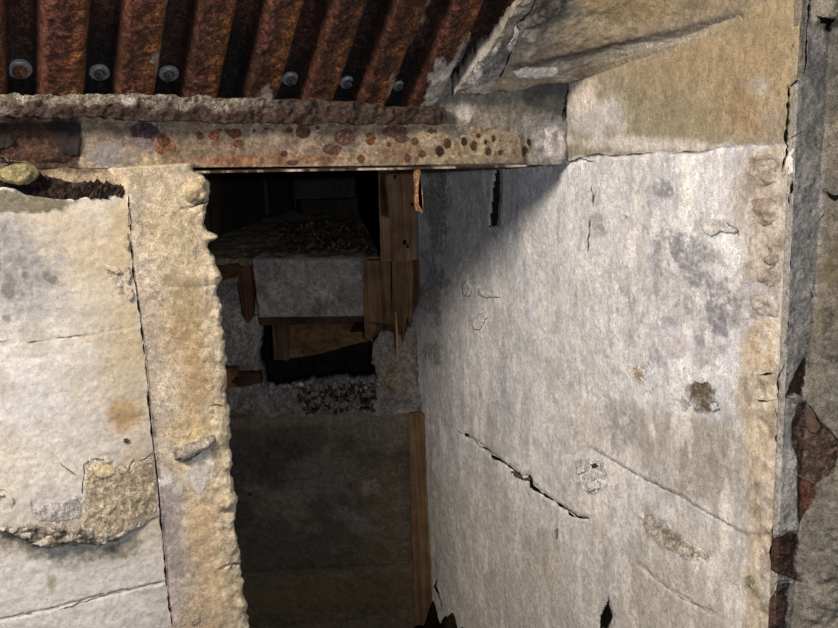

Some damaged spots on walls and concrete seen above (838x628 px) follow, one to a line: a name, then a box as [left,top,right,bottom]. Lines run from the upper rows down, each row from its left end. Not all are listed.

crack [492,0,535,82]
rust [196,120,243,147]
rust [286,125,320,139]
rust [322,129,355,155]
rust [366,125,426,162]
rust [436,138,451,157]
rust [461,133,504,156]
crack [781,0,810,203]
crack [52,197,172,624]
crack [757,366,837,441]
spalling [0,453,158,549]
crack [457,430,586,518]